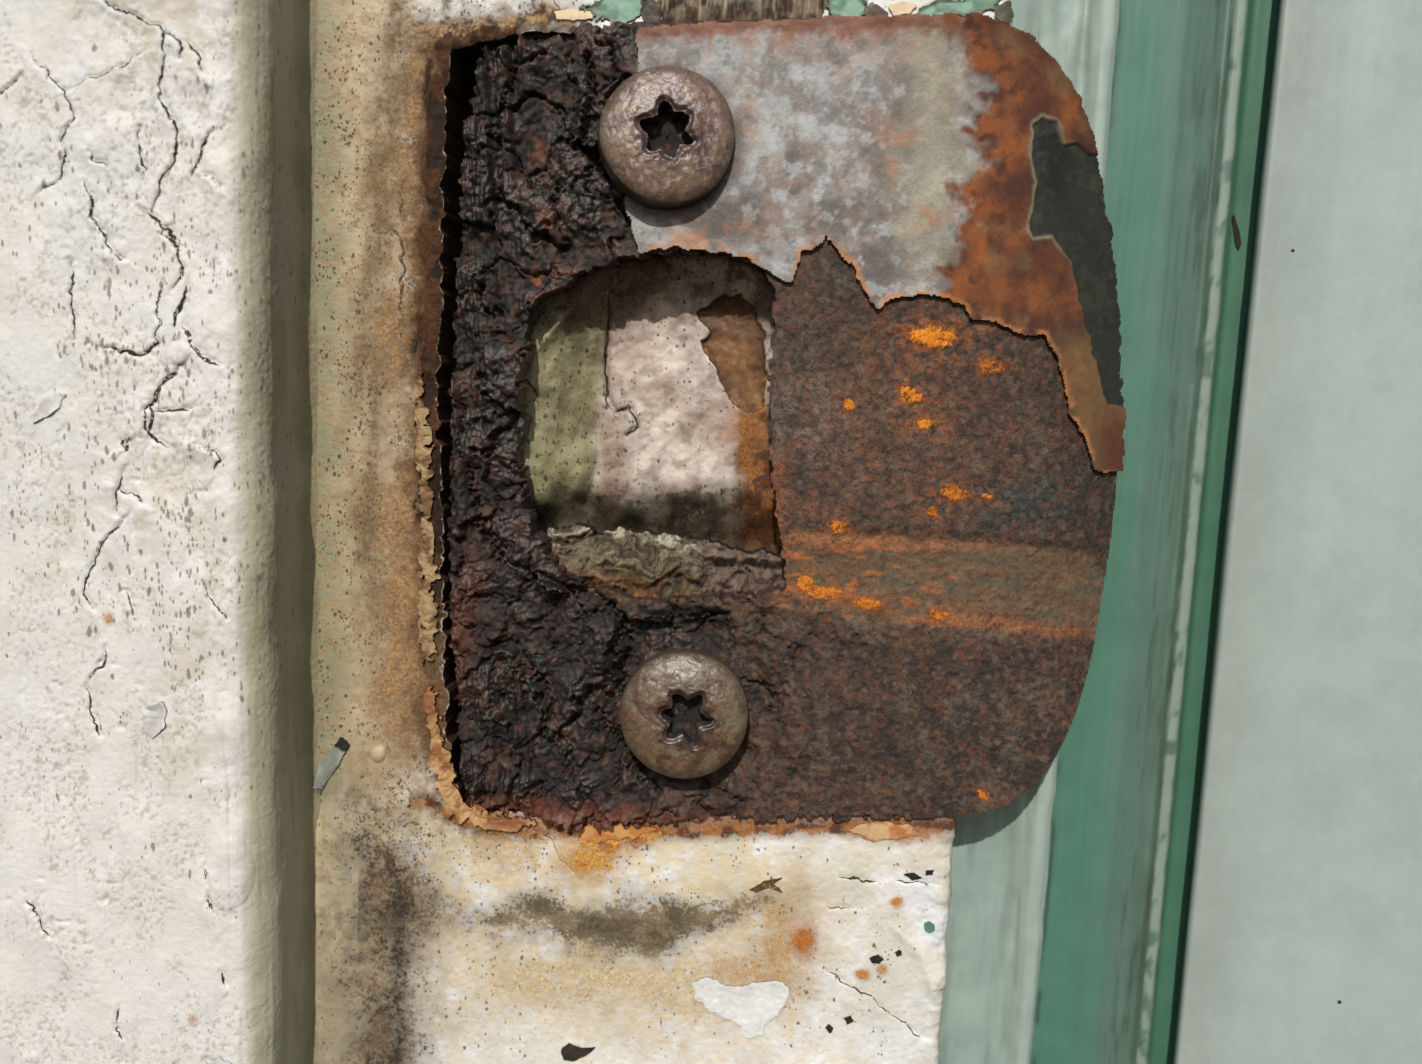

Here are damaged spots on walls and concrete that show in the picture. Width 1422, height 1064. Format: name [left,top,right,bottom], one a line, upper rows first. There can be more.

peeling [554,0,1014,25]
crack [1,0,221,607]
crack [385,186,413,343]
corrosion [898,325,957,348]
corrosion [350,1,578,771]
corrosion [733,406,782,549]
corrosion [797,573,882,610]
crack [86,650,107,734]
corrosion [409,795,957,878]
crack [26,900,48,935]
damp [329,788,822,1064]
peeling [692,976,789,1038]